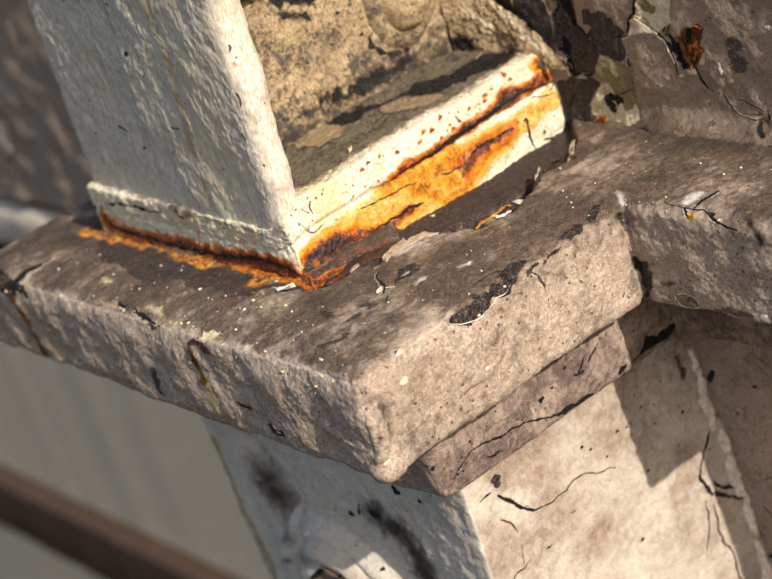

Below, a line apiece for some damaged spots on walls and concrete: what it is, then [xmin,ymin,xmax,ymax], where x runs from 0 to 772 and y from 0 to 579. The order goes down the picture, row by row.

peeling [291,124,346,149]
rust [78,87,562,290]
peeling [321,0,671,288]
rust [529,56,549,73]
crack [622,31,771,138]
crack [0,261,49,310]
peeling [404,205,600,351]
crack [480,467,616,579]
crack [698,431,744,579]